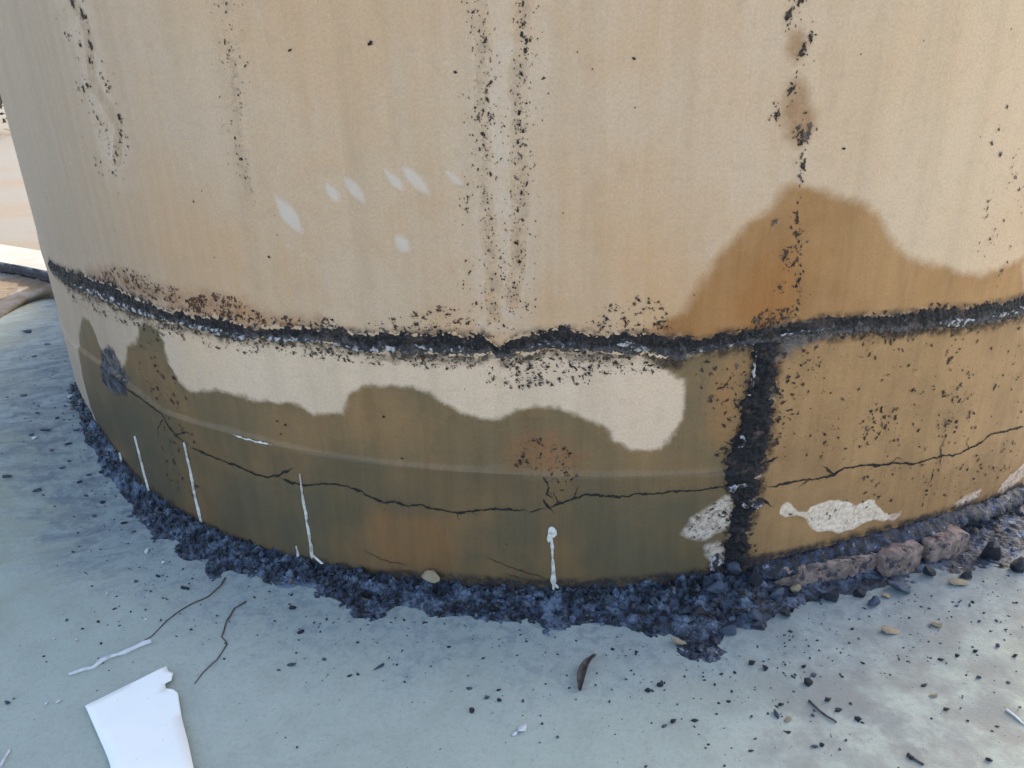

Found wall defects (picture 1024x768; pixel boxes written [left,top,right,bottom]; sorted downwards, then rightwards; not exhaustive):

crack [48,260,1024,575]
leakage [76,14,1024,590]
corrosion [725,238,810,331]
peeling [779,440,1024,535]